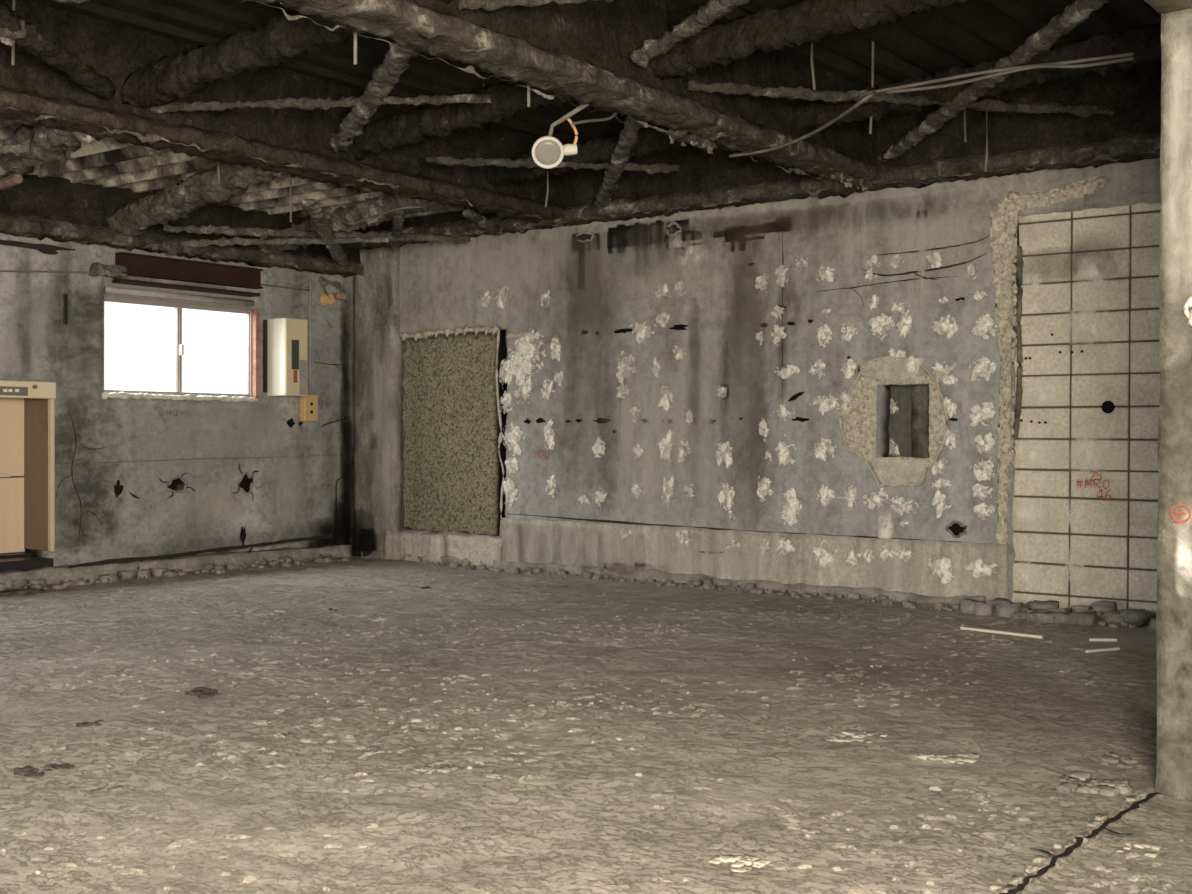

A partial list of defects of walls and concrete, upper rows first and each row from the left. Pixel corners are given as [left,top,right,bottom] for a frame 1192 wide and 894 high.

spalling [0,174,23,190]
peeling [830,172,874,192]
spalling [970,176,1107,544]
peeling [815,440,827,461]
spalling [817,294,967,538]
crack [998,792,1161,894]